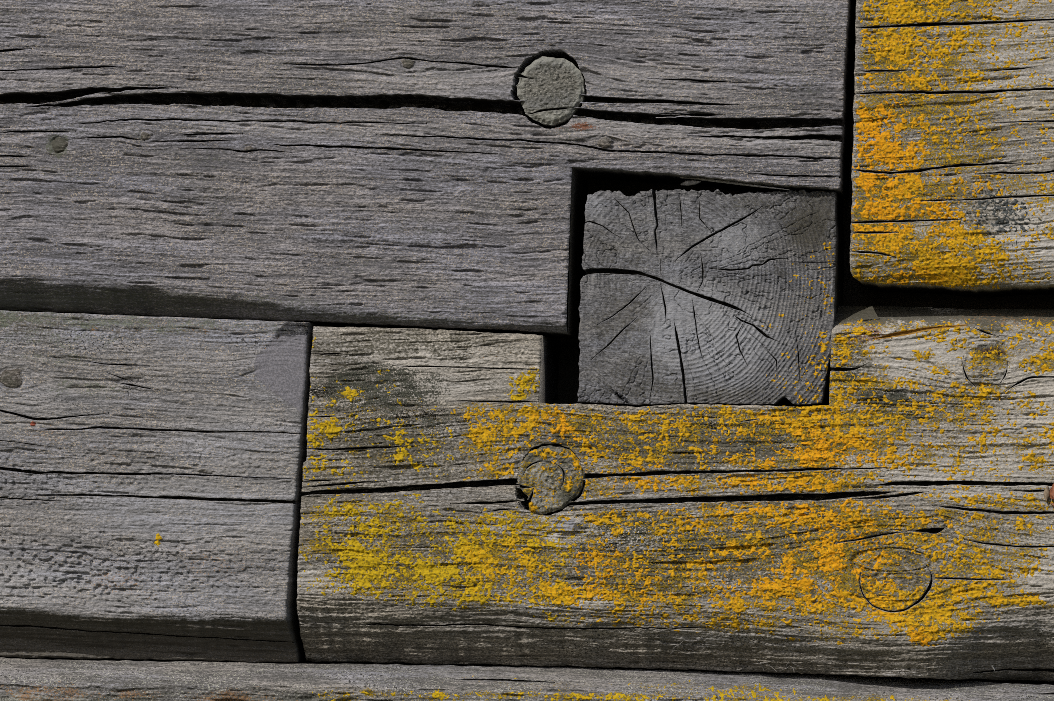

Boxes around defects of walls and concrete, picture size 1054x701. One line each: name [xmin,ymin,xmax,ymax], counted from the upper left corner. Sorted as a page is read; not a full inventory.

crack [0,48,126,72]
crack [283,56,535,87]
crack [855,66,1054,95]
crack [0,77,1054,402]
crack [446,397,536,405]
crack [0,409,407,504]